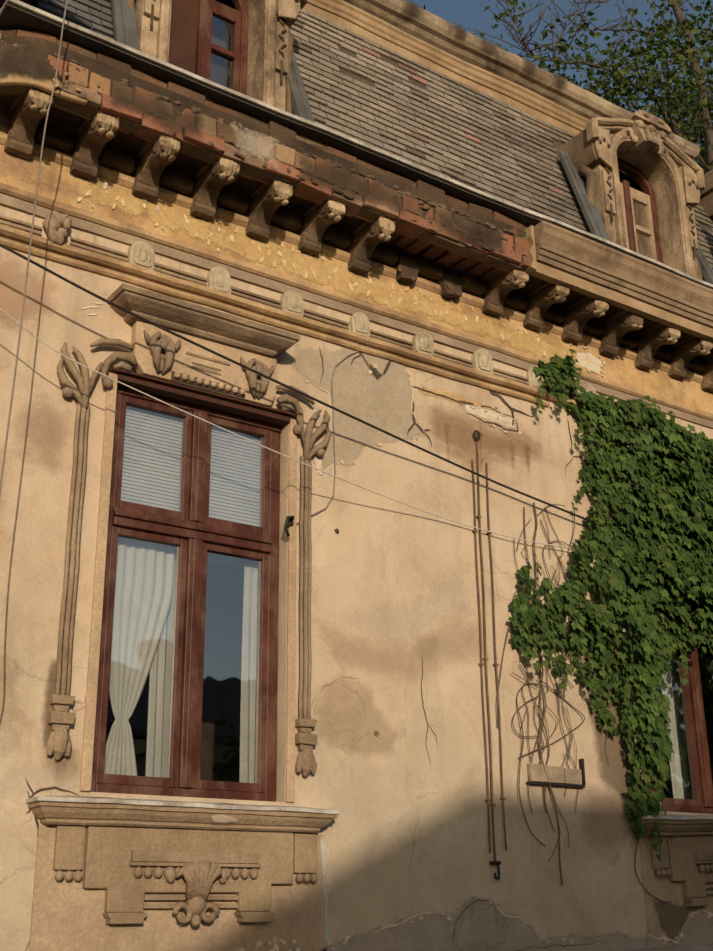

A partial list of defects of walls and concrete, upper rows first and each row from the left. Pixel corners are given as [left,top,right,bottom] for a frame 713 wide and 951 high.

spalling [0,29,537,276]
peeling [21,158,605,377]
peeling [292,342,521,475]
crack [421,659,437,765]
peeling [322,894,713,951]